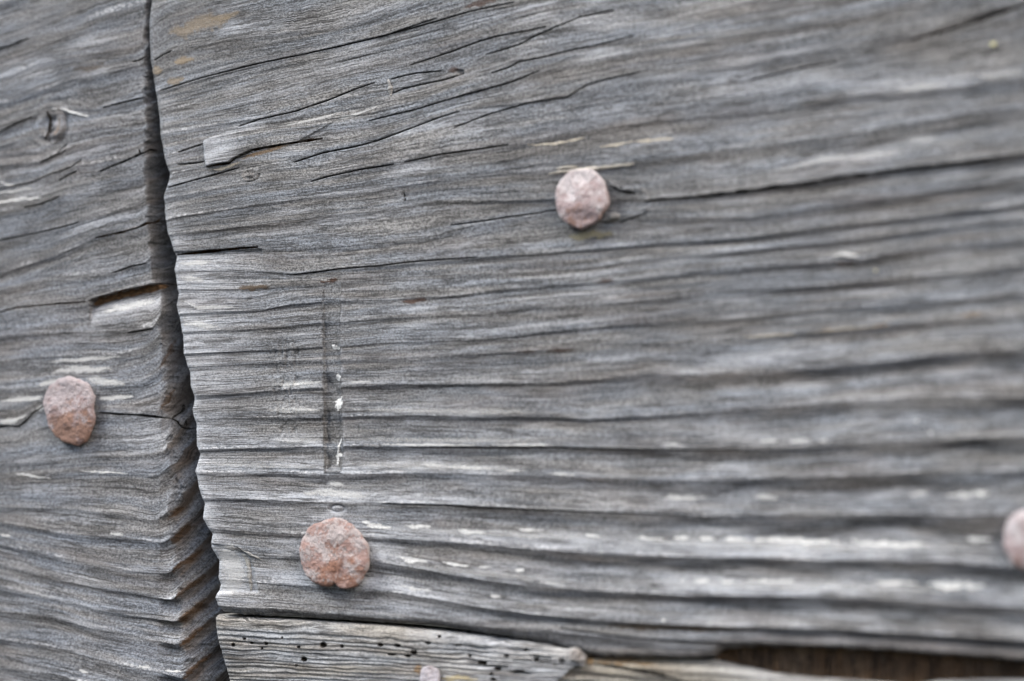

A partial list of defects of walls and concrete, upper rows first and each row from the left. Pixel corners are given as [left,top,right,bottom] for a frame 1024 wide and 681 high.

crack [1,2,646,208]
crack [454,210,556,225]
crack [177,247,258,255]
crack [105,404,192,430]